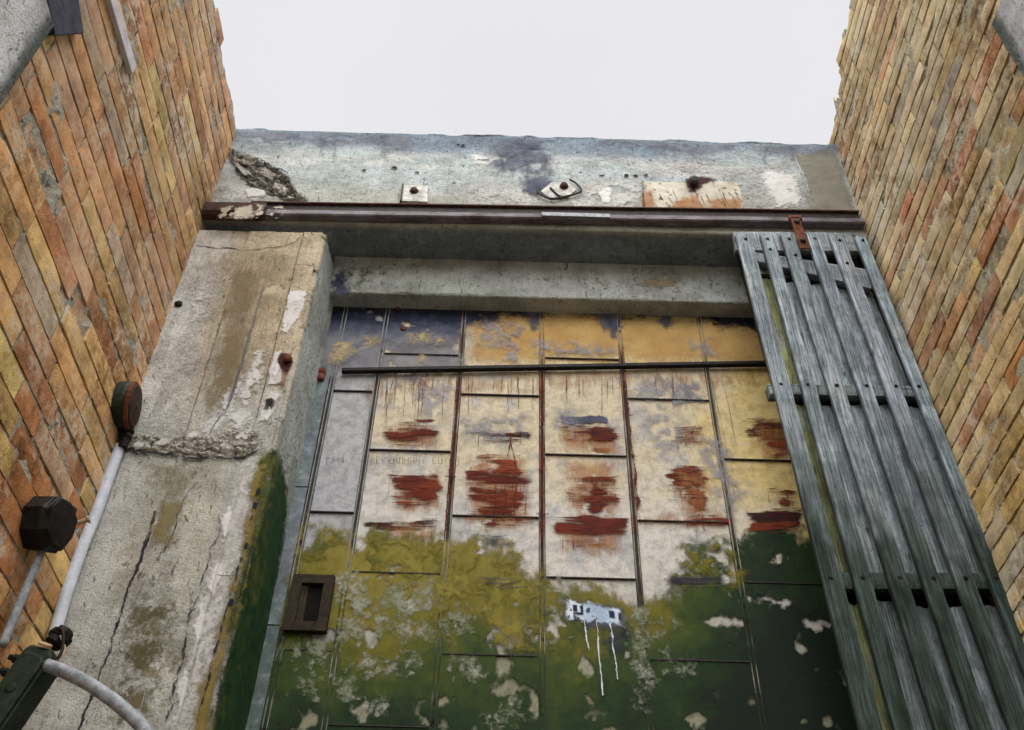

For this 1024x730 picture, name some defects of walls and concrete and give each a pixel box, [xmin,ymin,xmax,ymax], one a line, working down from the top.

spalling [219,147,308,219]
damp [468,138,559,205]
damp [599,141,811,208]
spalling [124,351,283,458]
rust [277,353,294,386]
crack [78,233,312,730]
rust [364,377,641,551]
rust [665,466,732,532]
damp [105,453,258,730]
peeling [330,571,472,716]
peeling [447,658,486,681]
peeling [621,608,665,685]